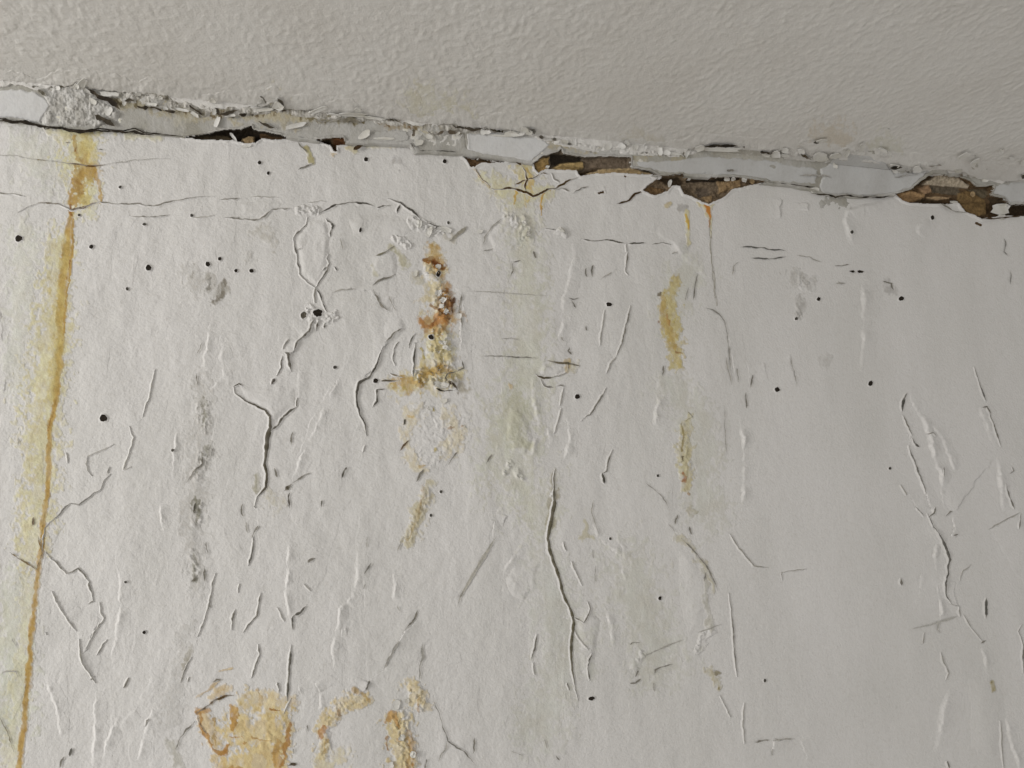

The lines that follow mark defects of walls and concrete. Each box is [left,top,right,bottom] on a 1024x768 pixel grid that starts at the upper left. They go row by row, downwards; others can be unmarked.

leakage [0,554,48,756]
leakage [0,116,71,406]
crack [0,192,468,749]
flaking render [0,82,1024,226]
crack [545,450,612,701]
crack [490,239,678,434]
leakage [451,218,724,768]
crack [630,484,737,692]
leakage [639,356,747,551]
crack [685,227,894,449]
crack [899,393,988,680]
crack [973,367,1021,530]